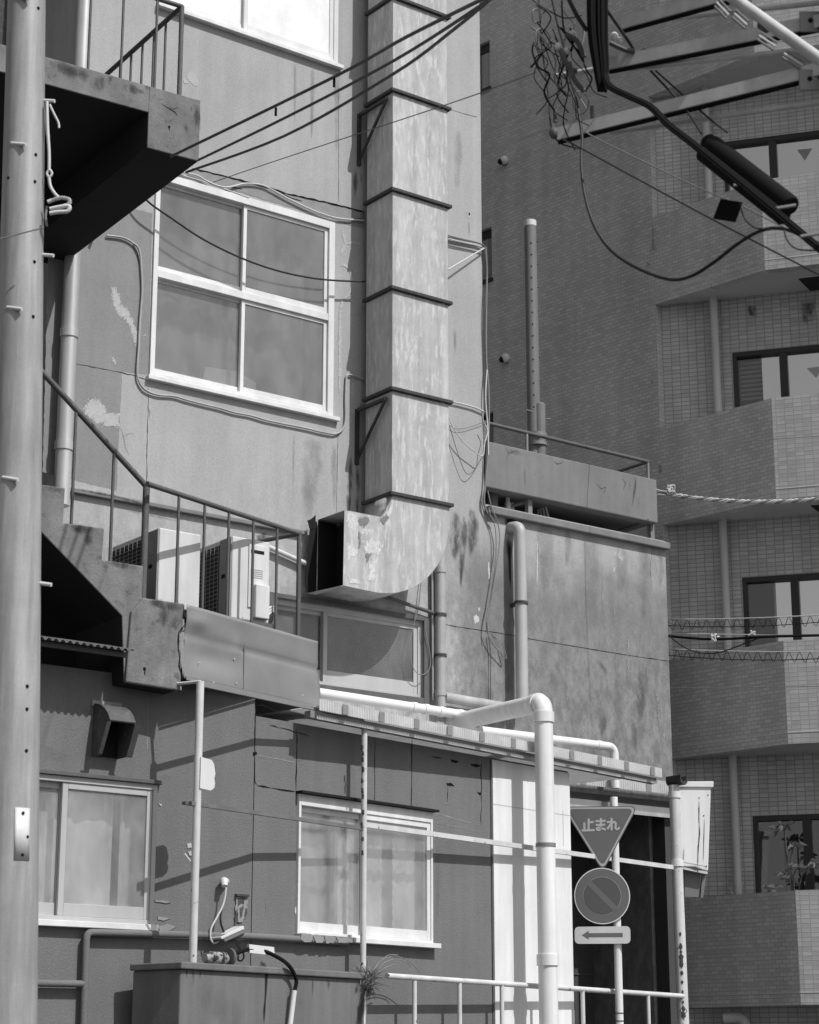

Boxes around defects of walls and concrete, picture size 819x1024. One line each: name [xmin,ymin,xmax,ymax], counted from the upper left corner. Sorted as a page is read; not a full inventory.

peeling [110,284,146,347]
peeling [102,412,121,428]
peeling [346,506,391,584]
crack [177,610,185,678]